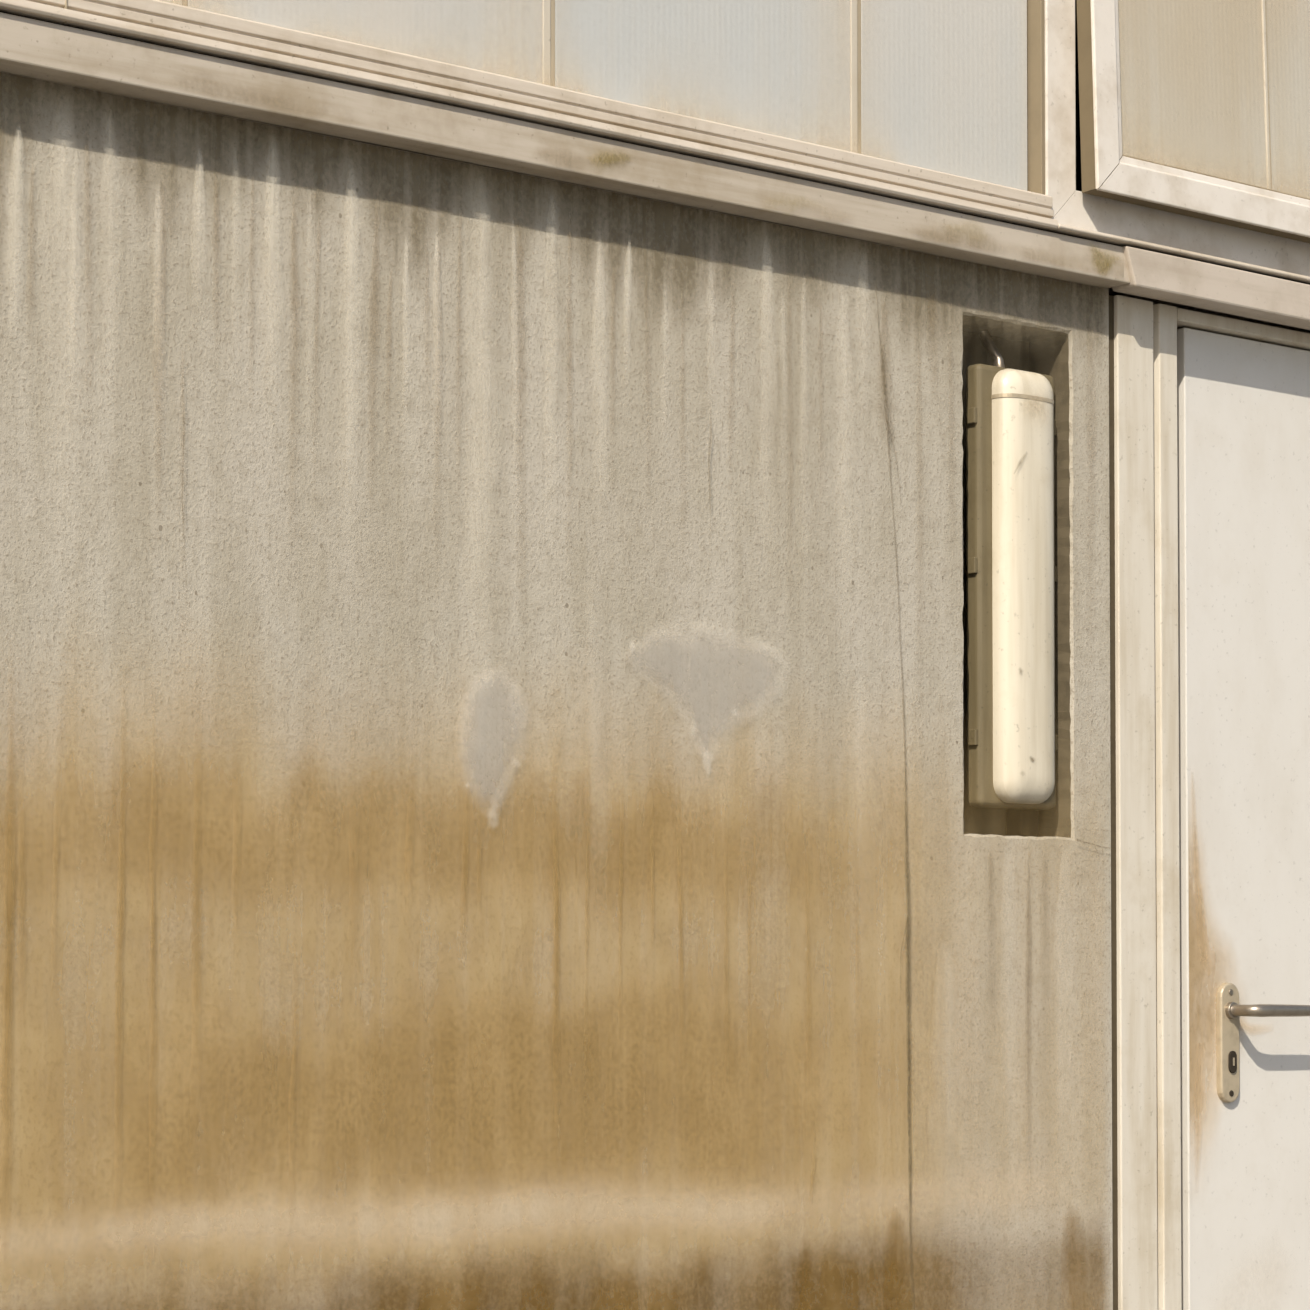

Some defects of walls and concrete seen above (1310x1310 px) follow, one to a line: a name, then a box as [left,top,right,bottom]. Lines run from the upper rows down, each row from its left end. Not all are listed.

damp [0,72,469,248]
damp [485,167,1100,329]
corrosion [1188,866,1218,1118]